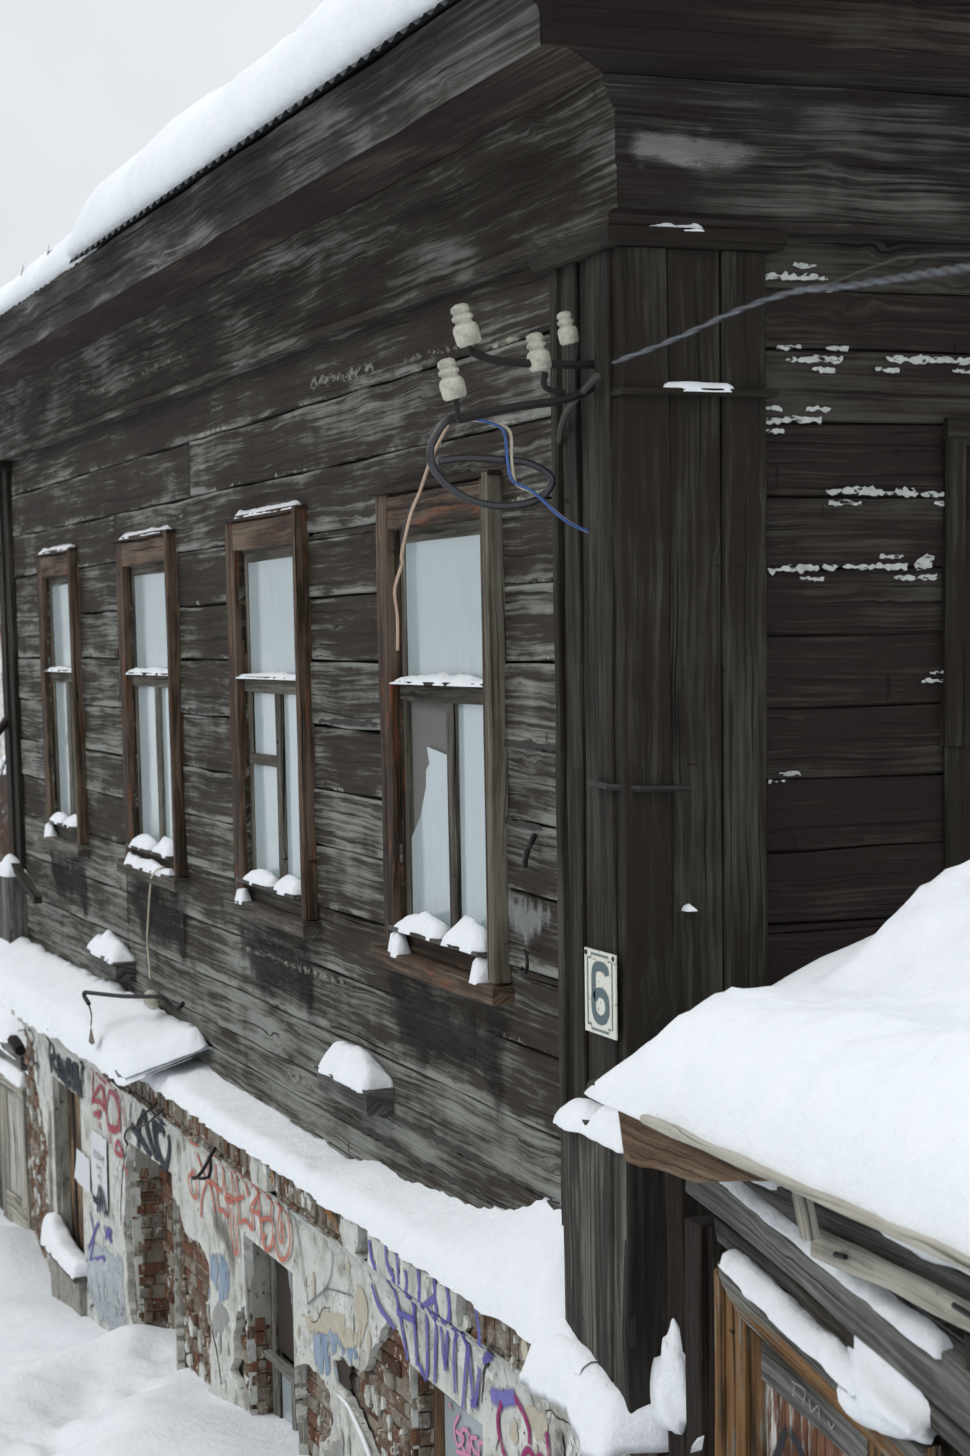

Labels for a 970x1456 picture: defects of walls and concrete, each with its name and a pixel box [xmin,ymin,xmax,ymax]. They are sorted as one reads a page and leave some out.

peeling [766,262,831,293]
peeling [777,345,849,373]
peeling [875,354,970,374]
peeling [766,405,831,434]
peeling [826,485,944,506]
peeling [767,553,937,581]
flaking render [24,1028,51,1272]
spalling [106,1075,252,1182]
flaking render [86,1168,153,1330]
flaking render [179,1207,267,1414]
flaking render [272,1170,431,1456]
peeling [509,1404,552,1453]